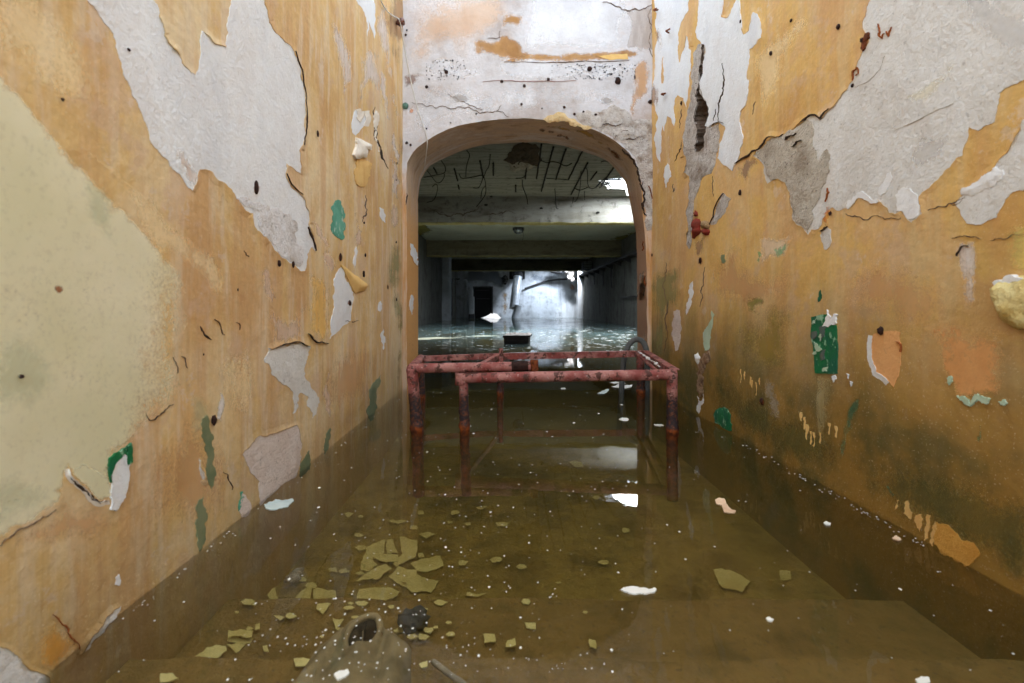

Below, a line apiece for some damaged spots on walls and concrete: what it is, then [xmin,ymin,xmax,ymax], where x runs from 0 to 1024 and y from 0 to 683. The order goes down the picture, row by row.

flaking render [87,0,320,299]
flaking render [334,0,388,187]
crack [413,2,653,117]
peeling [474,15,637,62]
flaking render [543,0,1024,262]
flaking render [330,200,368,338]
flaking render [64,443,133,511]
flaking render [238,337,320,518]
peeling [867,331,901,387]
peeling [933,522,980,567]